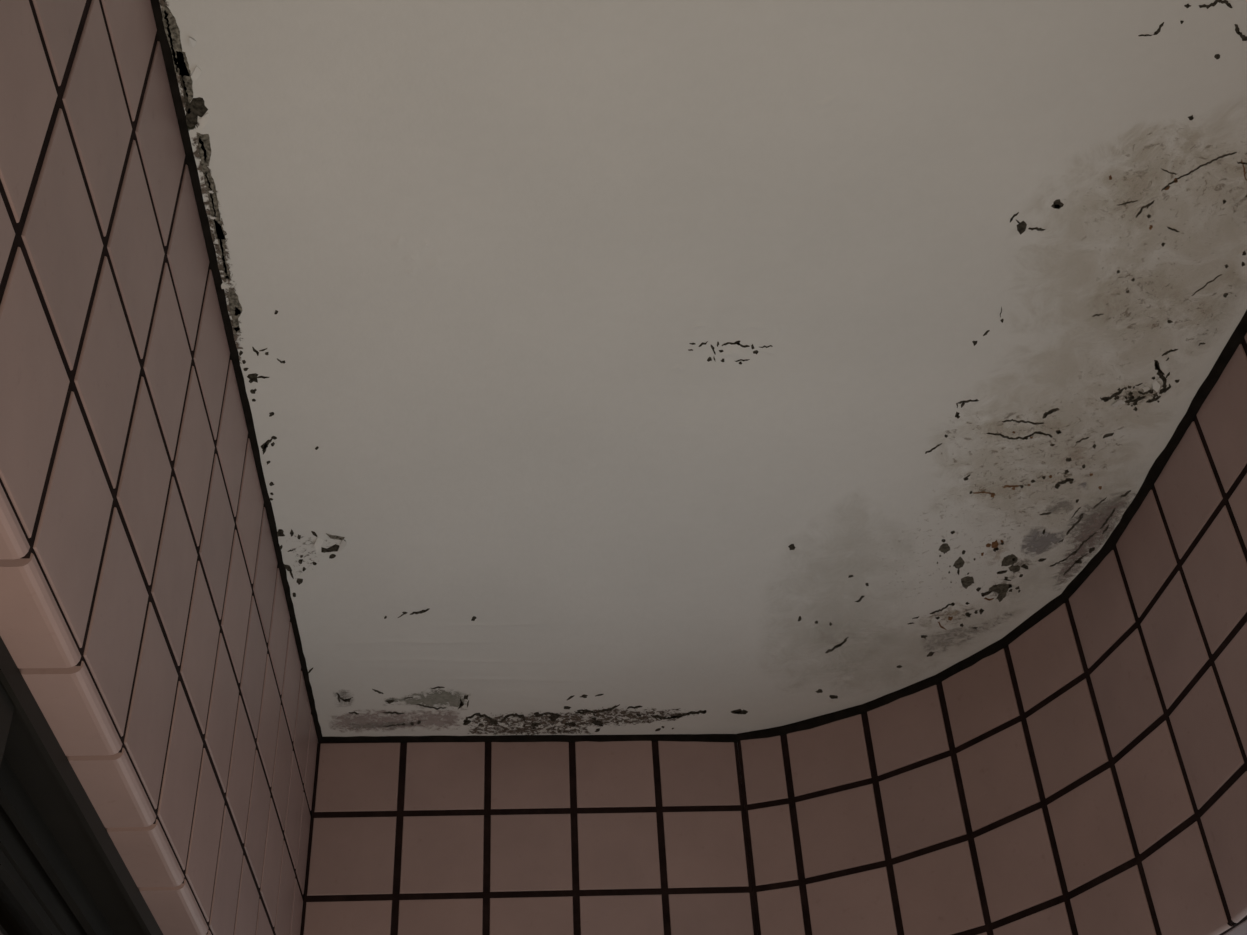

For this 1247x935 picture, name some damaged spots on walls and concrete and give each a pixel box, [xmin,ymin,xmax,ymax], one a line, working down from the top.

flaking render [159,0,243,361]
flaking render [277,529,347,597]
water stain [937,483,1131,602]
flaking render [463,694,706,735]